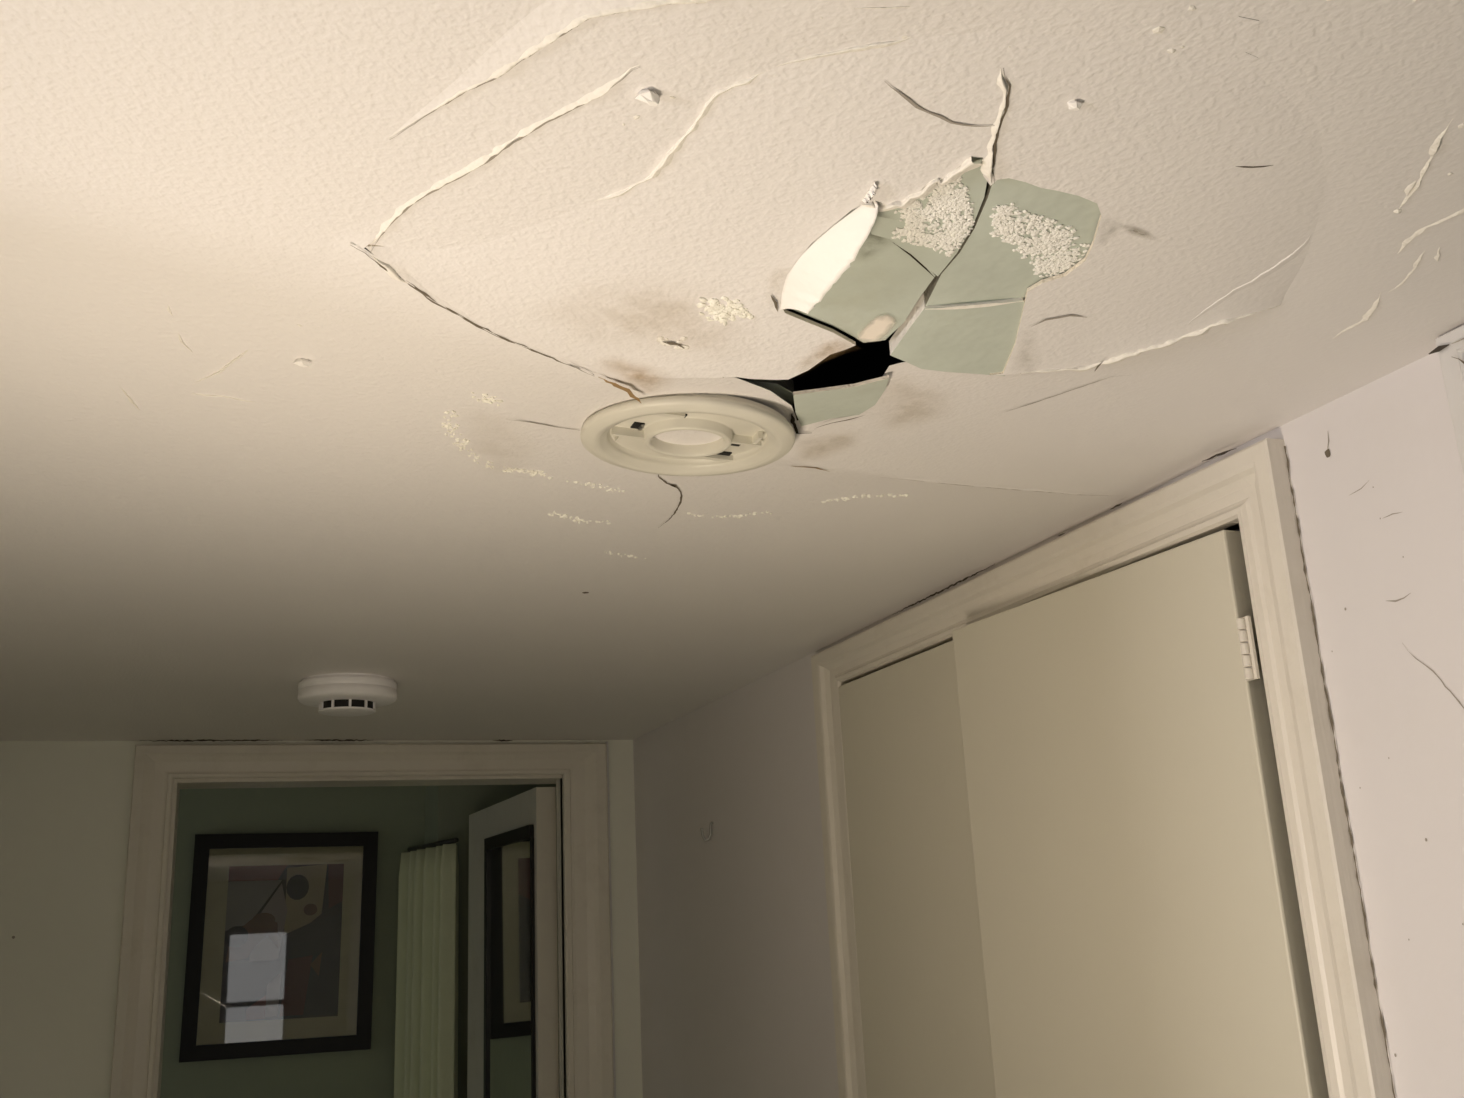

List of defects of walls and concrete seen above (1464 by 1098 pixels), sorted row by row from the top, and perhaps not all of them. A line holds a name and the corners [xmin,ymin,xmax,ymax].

peeling [390,0,711,137]
spalling [771,157,1312,376]
spalling [696,296,754,326]
peeling [657,336,689,350]
spalling [735,375,889,434]
crack [658,475,682,526]